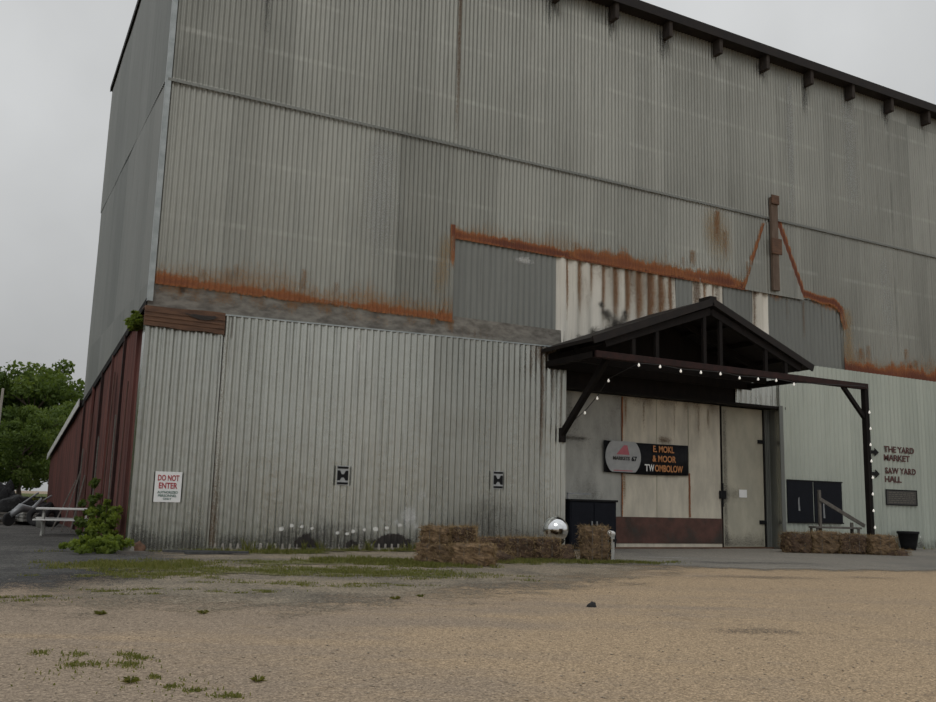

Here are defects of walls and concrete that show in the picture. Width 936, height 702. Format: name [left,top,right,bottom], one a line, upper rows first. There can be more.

rust [154,205,789,340]
rust [778,221,936,382]